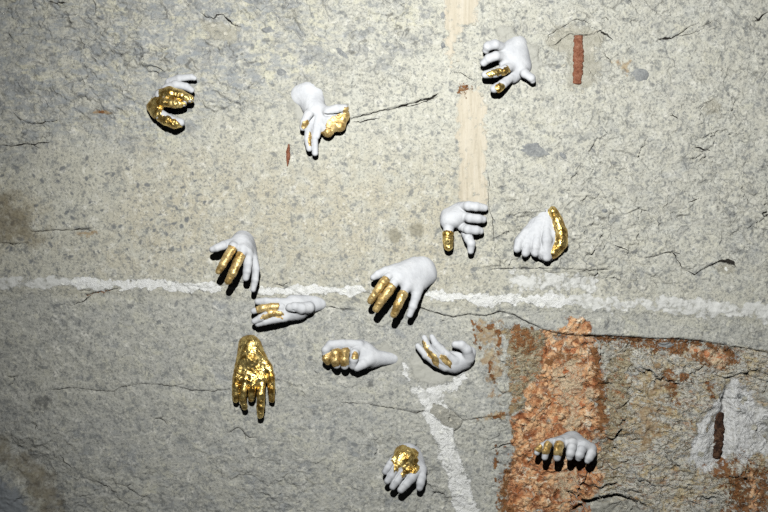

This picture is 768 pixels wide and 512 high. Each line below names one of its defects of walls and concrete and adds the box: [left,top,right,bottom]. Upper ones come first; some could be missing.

crack [351,94,437,122]
crack [5,113,57,148]
crack [615,245,717,275]
corrosion [492,316,741,512]
spalling [686,378,768,473]
spalling [572,497,641,512]